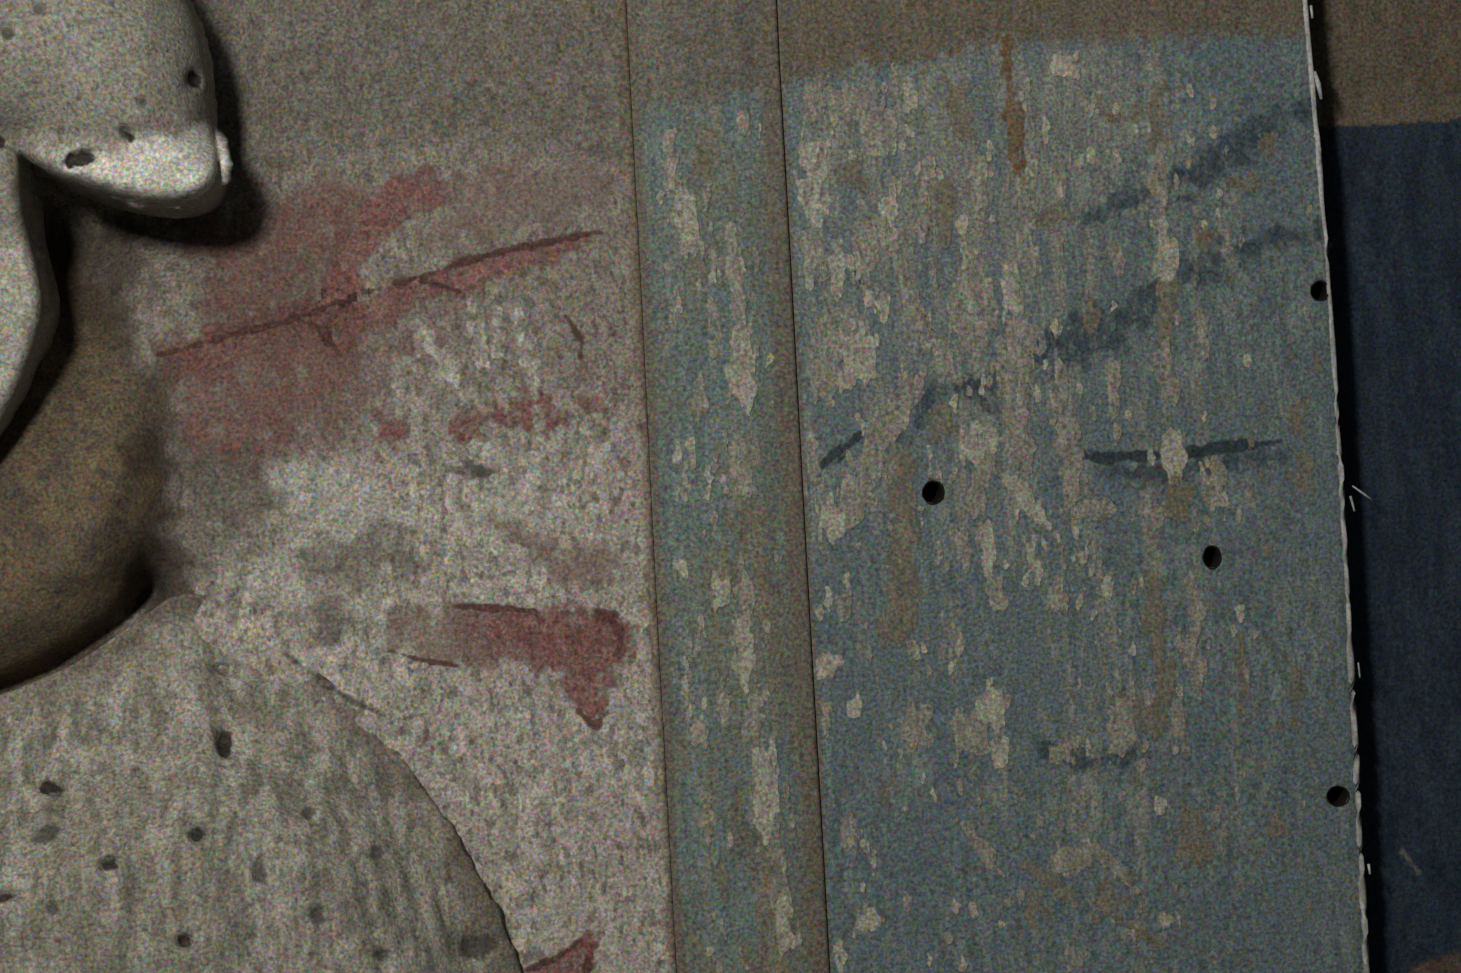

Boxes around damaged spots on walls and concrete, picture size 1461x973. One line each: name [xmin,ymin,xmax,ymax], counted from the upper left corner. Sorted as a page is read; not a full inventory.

peeling [737,107,761,155]
corrosion [1001,36,1026,185]
peeling [656,126,774,537]
peeling [793,51,1313,867]
spalling [1273,0,1373,973]
peeling [672,559,688,580]
peeling [681,555,802,973]
peeling [833,812,912,973]
peeling [951,818,1181,955]